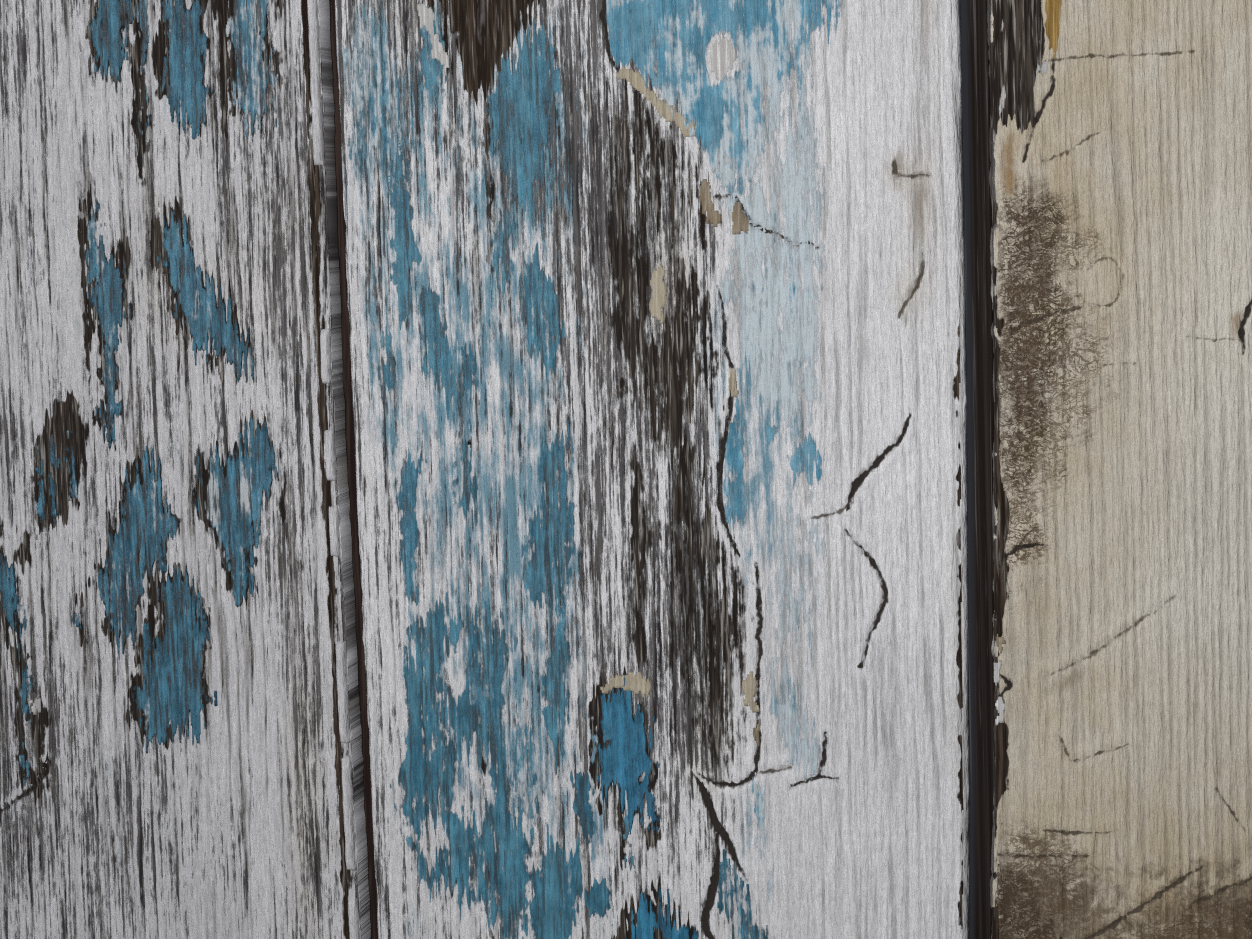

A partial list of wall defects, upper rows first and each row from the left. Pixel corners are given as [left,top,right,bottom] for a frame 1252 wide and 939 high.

peeling [0,184,133,806]
peeling [71,440,218,753]
peeling [85,0,283,186]
peeling [301,0,353,939]
peeling [341,0,570,525]
peeling [390,0,842,939]
crack [699,294,763,787]
crack [812,414,911,668]
leakage [994,192,1102,536]
leakage [991,832,1083,939]
crack [1083,866,1252,939]
leakage [1139,899,1252,939]